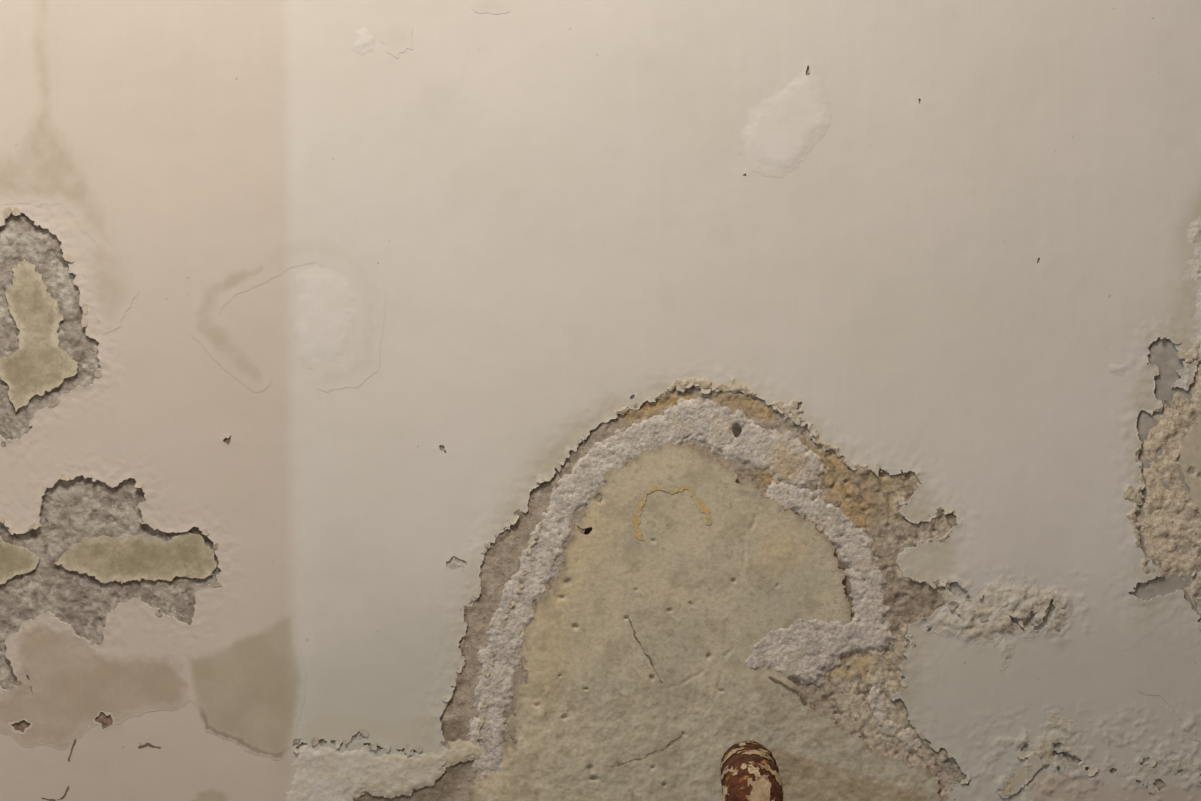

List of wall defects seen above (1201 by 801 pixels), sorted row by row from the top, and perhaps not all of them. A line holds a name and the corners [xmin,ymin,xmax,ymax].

spalling [0,207,102,446]
spalling [1123,216,1201,630]
spalling [0,474,222,690]
spalling [282,377,1075,801]
peeling [1013,705,1201,794]